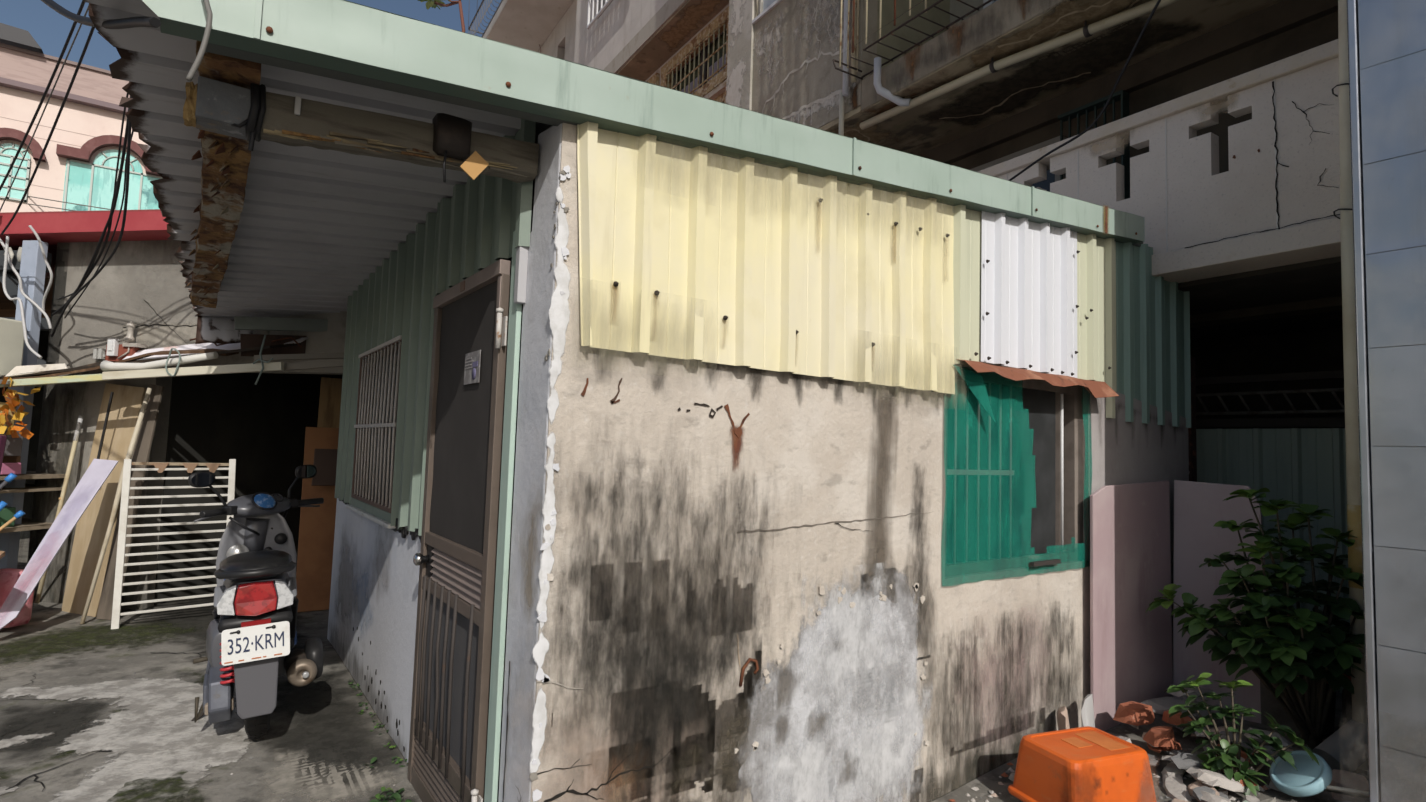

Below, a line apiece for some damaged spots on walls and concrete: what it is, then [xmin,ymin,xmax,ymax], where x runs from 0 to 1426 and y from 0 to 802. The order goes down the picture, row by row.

crack [762,36,856,125]
crack [1185,81,1340,248]
rust [724,404,750,466]
damp [751,368,761,394]
damp [868,386,910,590]
rust [956,359,1119,398]
damp [915,472,928,650]
crack [503,661,670,802]
damp [583,547,736,746]
damp [674,714,749,802]
spalling [734,563,930,802]
peeling [949,762,1015,802]